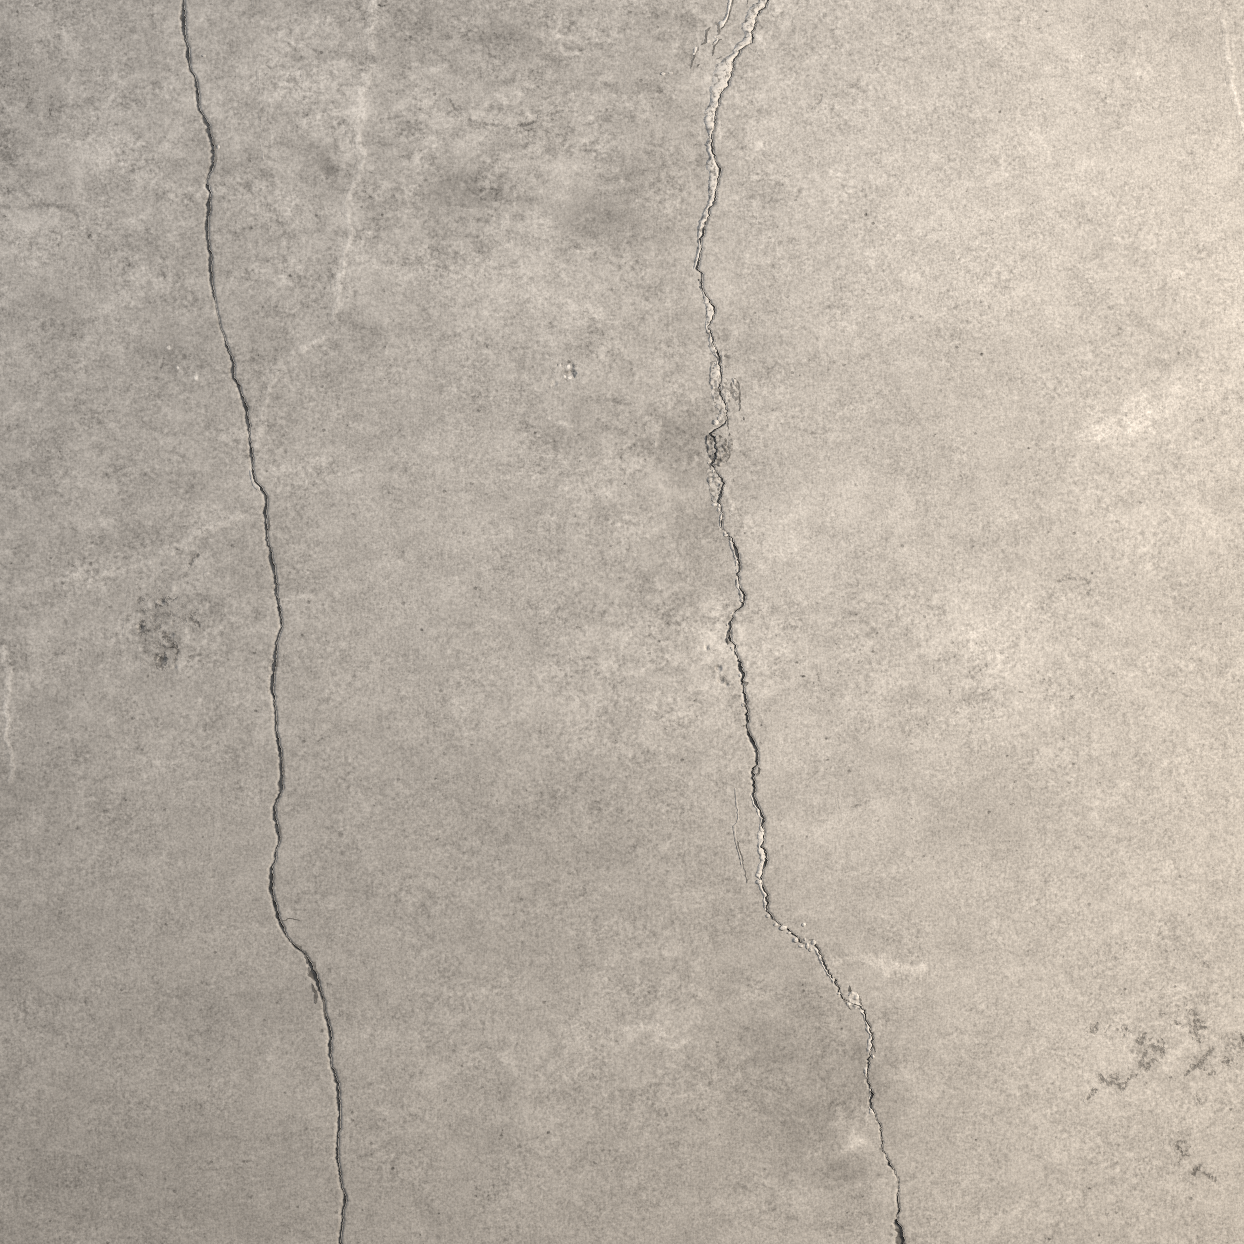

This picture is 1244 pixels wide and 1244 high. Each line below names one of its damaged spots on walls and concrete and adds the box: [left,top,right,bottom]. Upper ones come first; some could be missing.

crack [179,0,347,1244]
crack [660,0,905,1244]